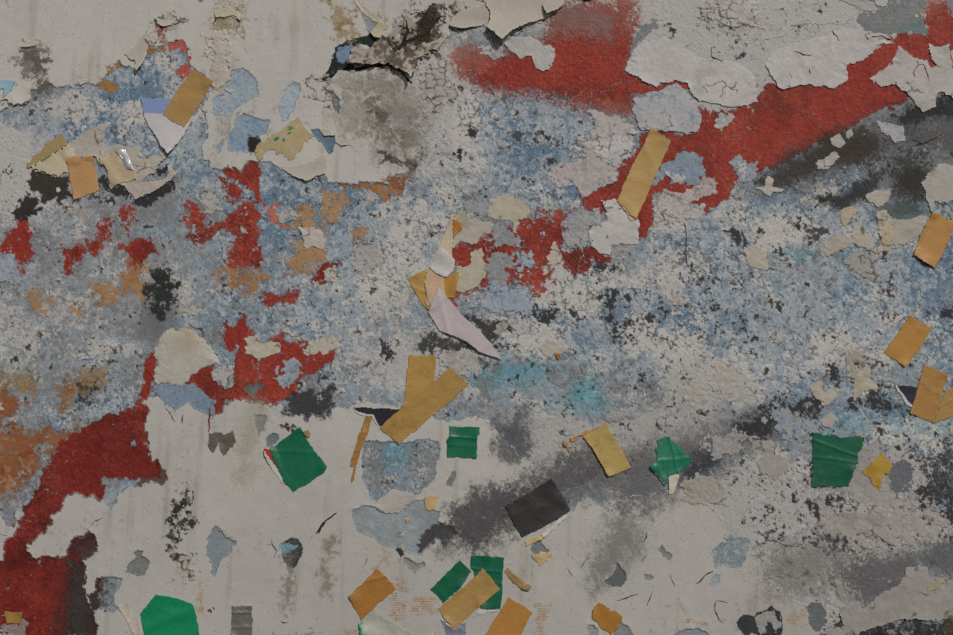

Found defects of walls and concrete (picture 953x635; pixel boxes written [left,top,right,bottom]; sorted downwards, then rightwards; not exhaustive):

peeling [212,68,259,116]
peeling [216,113,270,153]
peeling [278,82,301,121]
peeling [311,128,336,154]
peeling [367,107,411,134]
peeling [273,357,303,389]
peeling [242,374,306,418]
peeling [83,426,168,511]
peeling [86,550,150,635]
peeling [0,606,52,635]